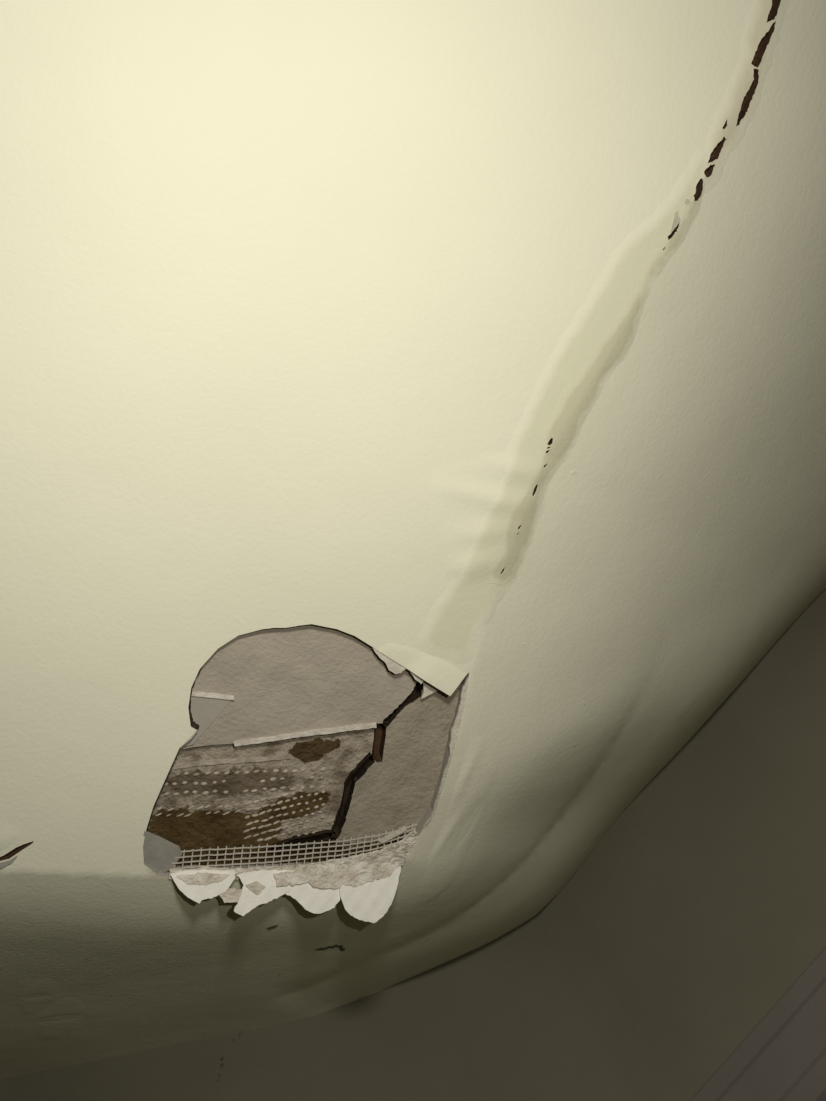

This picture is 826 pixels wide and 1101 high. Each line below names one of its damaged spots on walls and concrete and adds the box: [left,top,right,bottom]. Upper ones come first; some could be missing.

crack [663,0,781,250]
water stain [417,0,790,664]
crack [532,438,553,496]
spalling [188,650,217,730]
spalling [144,748,180,839]
peeling [410,673,469,835]
peeling [0,841,34,868]
peeling [143,852,401,923]